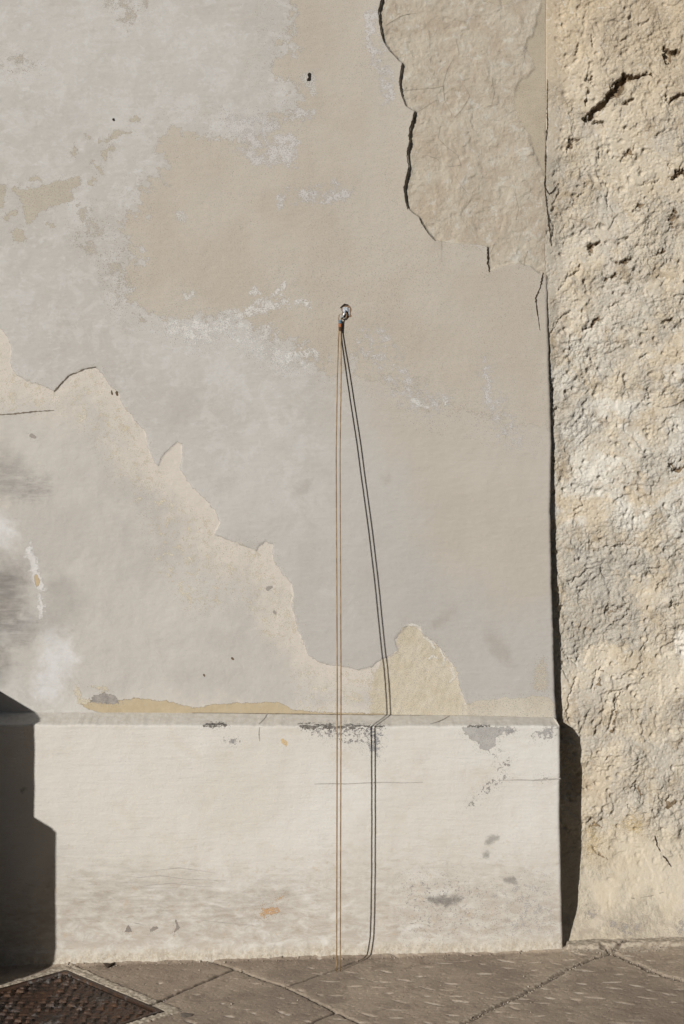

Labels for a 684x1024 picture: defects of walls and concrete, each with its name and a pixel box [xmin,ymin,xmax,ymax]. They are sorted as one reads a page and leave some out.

crack [378,0,436,241]
peeling [0,0,558,758]
crack [535,273,544,329]
damp [311,727,383,758]